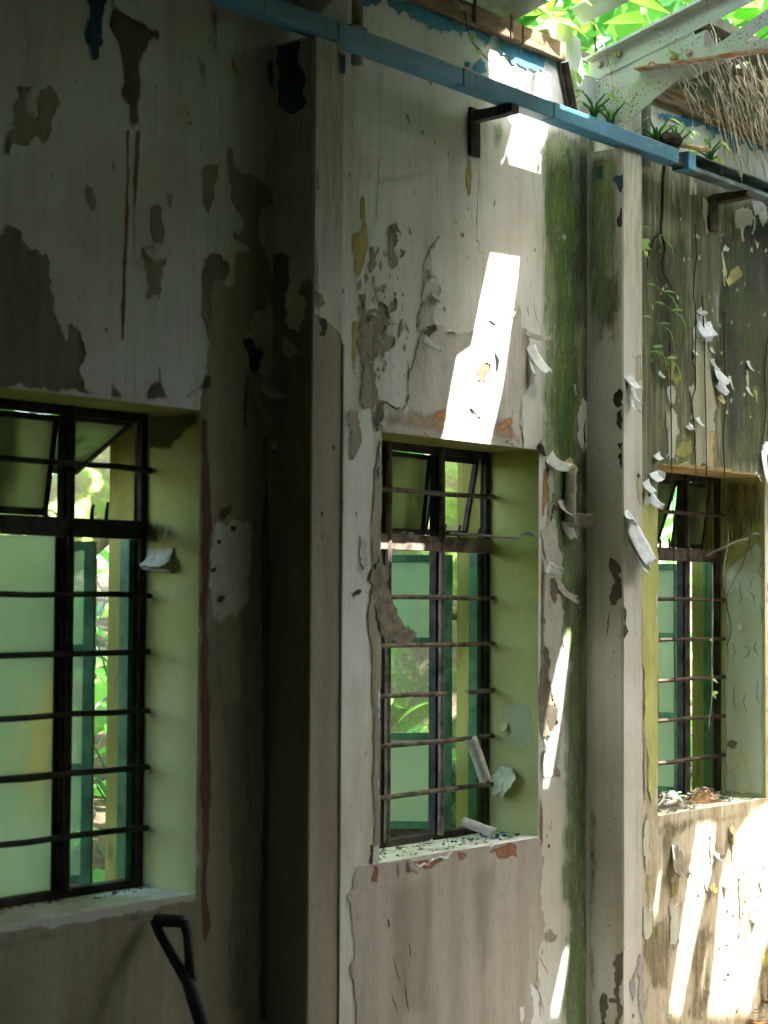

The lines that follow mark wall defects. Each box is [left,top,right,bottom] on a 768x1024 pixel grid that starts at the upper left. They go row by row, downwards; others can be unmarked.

peeling [4,85,60,155]
rust [121,130,140,340]
rust [200,419,212,939]
peeling [0,148,557,1024]
water stain [566,529,593,907]
water stain [546,150,617,514]
water stain [636,237,689,395]
peeling [607,294,768,640]
peeling [671,824,768,949]
water stain [713,203,768,465]